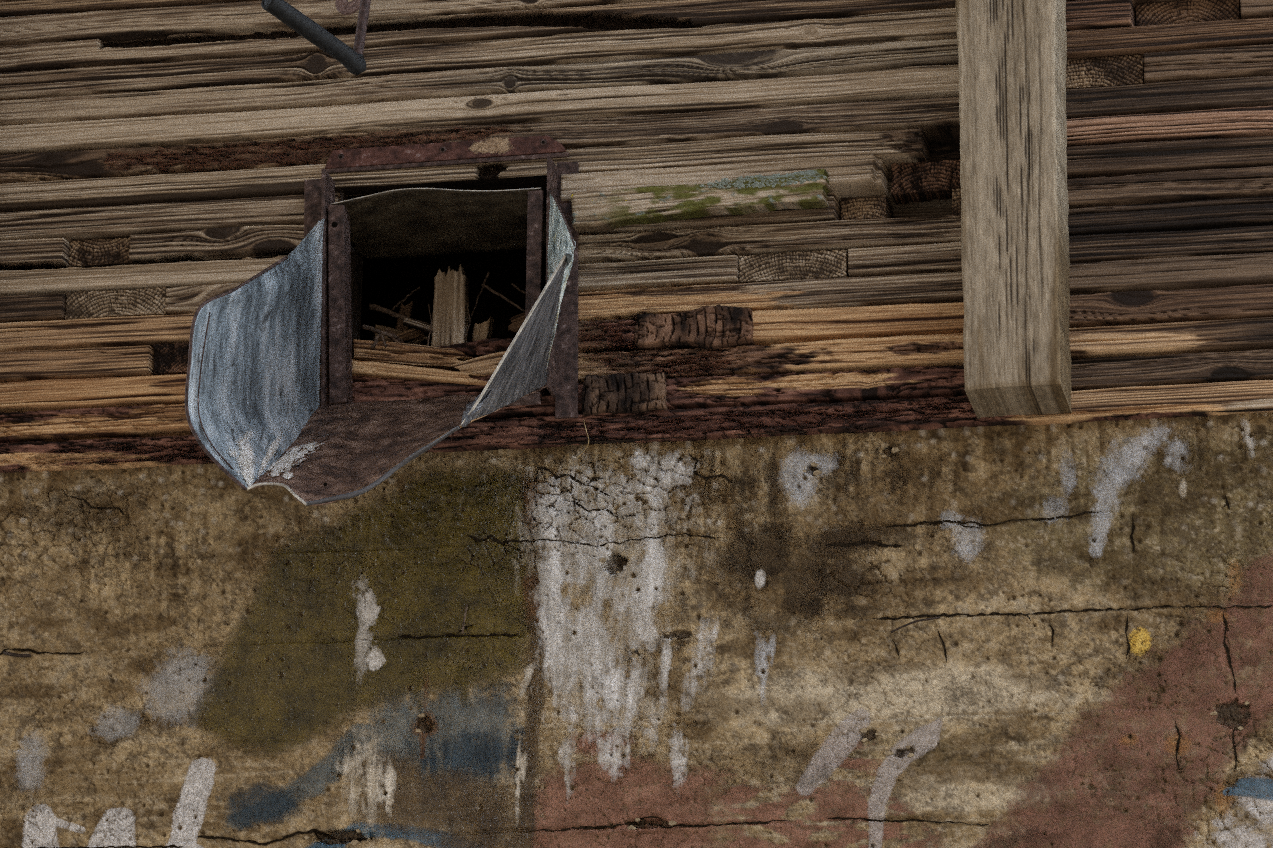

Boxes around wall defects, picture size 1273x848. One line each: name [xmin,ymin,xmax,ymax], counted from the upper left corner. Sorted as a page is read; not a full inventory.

leakage [1094,431,1161,555]
leakage [343,452,687,848]
leakage [692,630,716,690]
crack [871,605,1273,692]
crack [1175,721,1185,772]
crack [1230,726,1238,772]
crack [5,829,368,848]